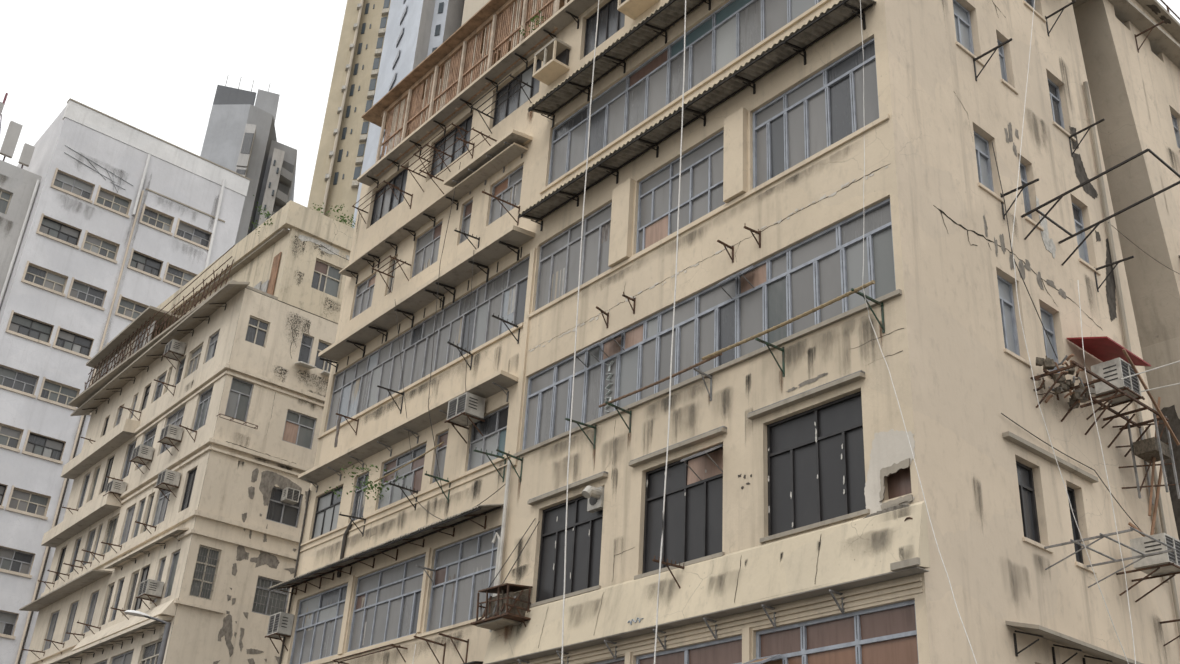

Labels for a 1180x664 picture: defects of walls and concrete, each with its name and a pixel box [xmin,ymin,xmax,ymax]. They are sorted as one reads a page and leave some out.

crack [933,205,1101,328]
spalling [863,458,913,519]
peeling [213,468,310,664]